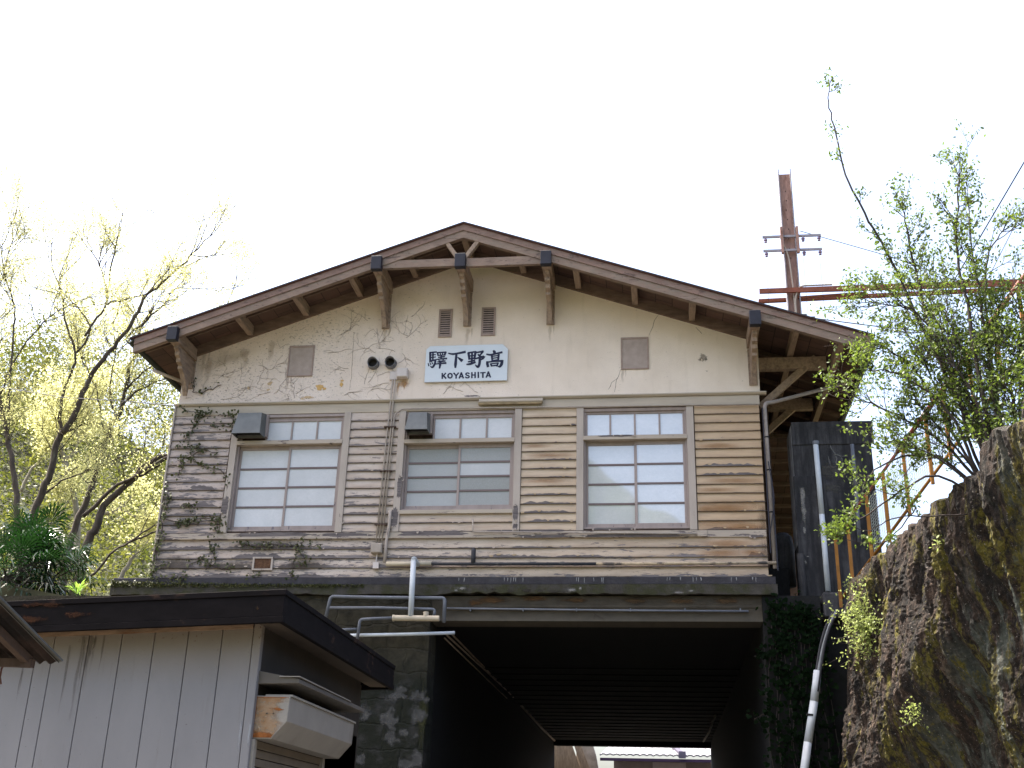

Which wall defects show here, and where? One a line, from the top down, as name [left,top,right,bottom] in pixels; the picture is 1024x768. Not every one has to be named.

peeling [702,463,759,475]
peeling [159,485,231,525]
peeling [224,469,765,577]
peeling [153,546,247,578]
rust [253,697,286,738]